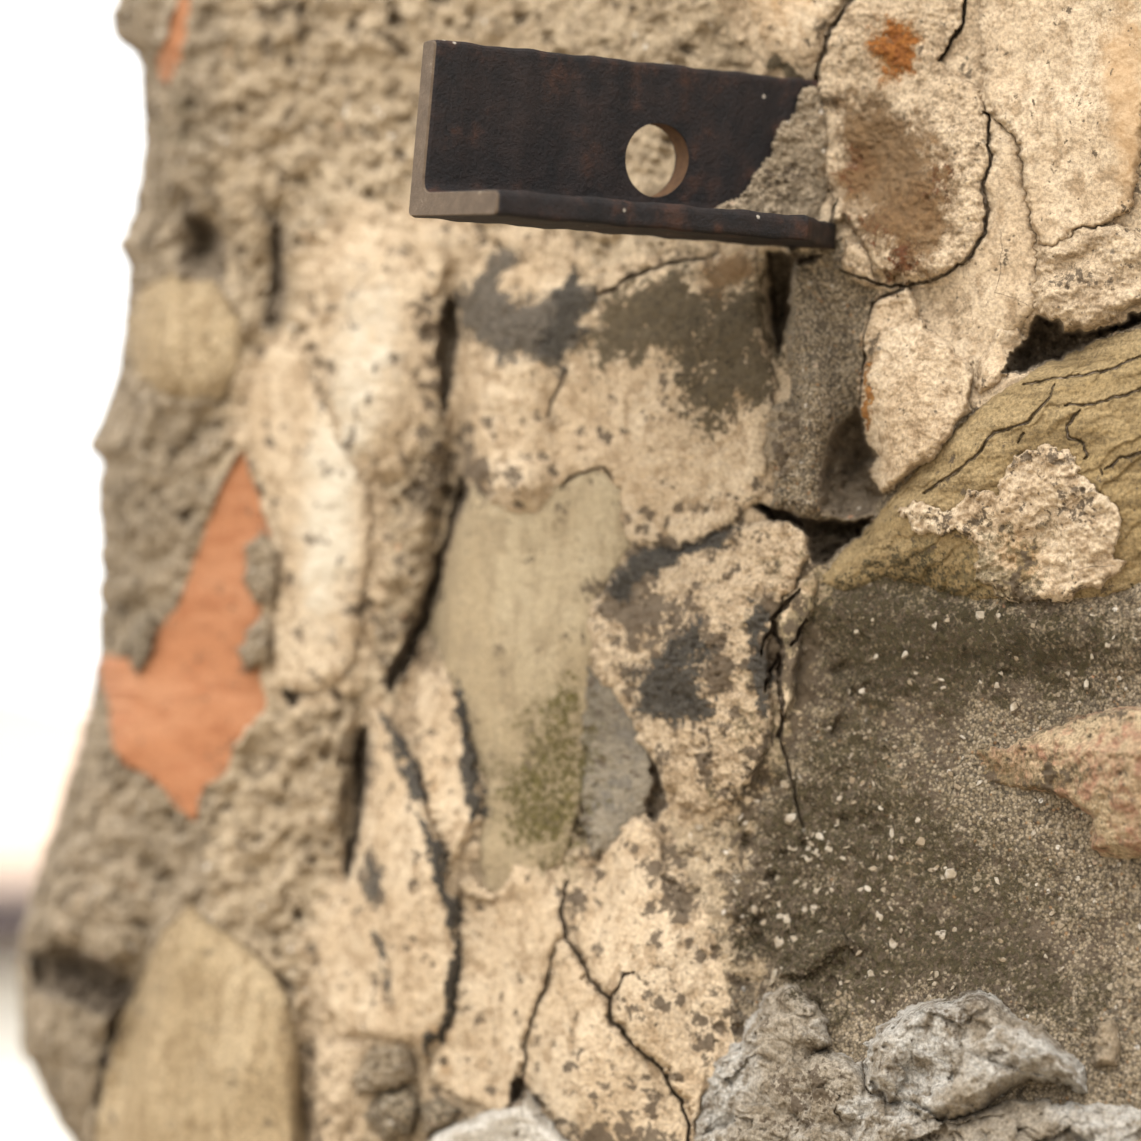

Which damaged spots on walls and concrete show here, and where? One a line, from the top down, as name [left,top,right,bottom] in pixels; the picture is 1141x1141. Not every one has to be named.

crack [815,0,852,78]
corrosion [819,14,964,285]
crack [843,112,1027,402]
crack [940,0,966,59]
crack [926,357,1141,492]
damp [453,671,614,885]
crack [761,590,806,831]
crack [480,881,691,1141]